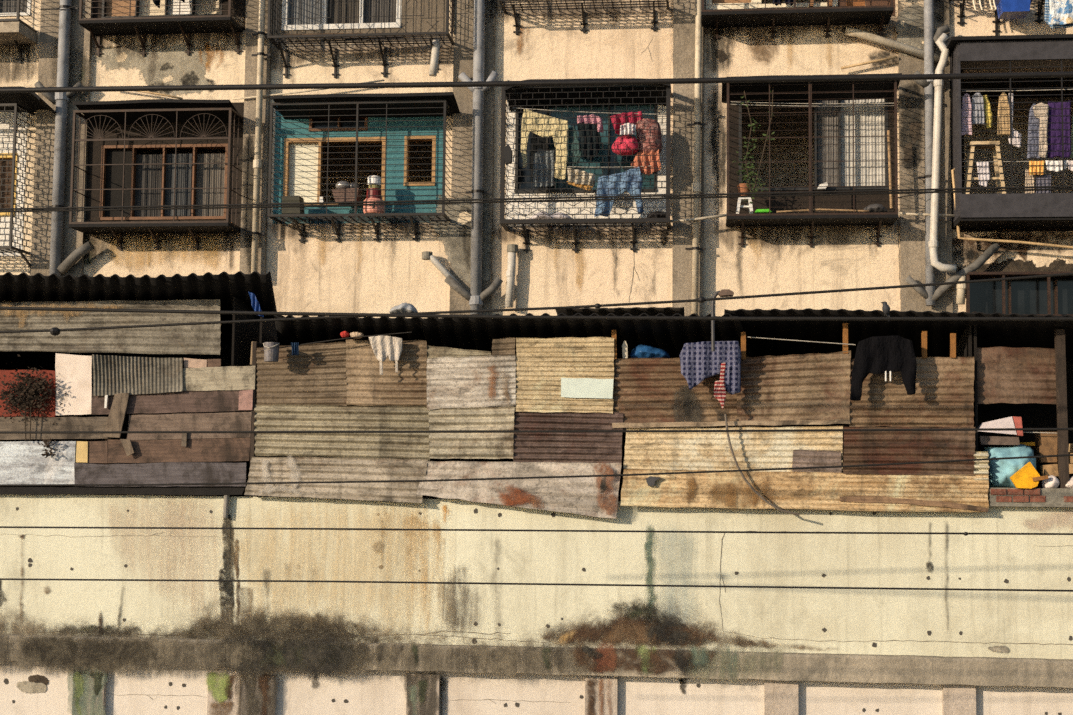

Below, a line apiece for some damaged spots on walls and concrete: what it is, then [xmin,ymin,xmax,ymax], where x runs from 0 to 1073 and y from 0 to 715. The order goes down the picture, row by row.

rust [501,488,544,508]
rust [594,463,617,515]
damp [0,513,782,715]